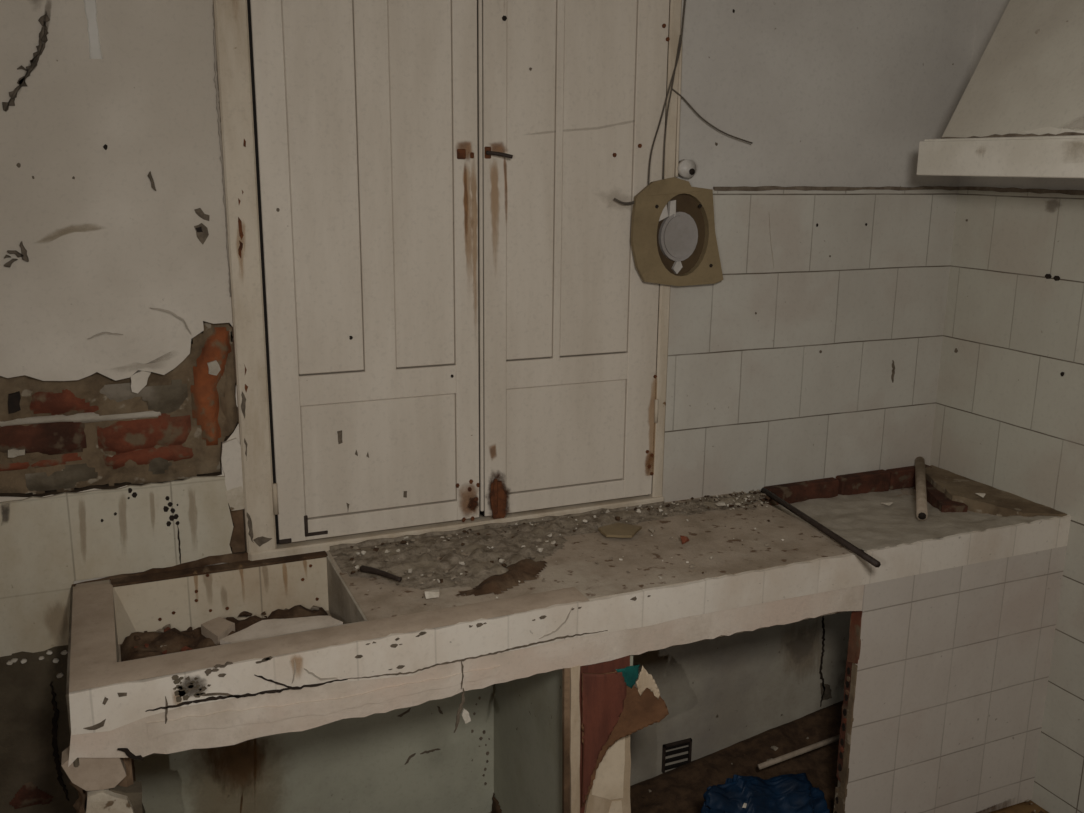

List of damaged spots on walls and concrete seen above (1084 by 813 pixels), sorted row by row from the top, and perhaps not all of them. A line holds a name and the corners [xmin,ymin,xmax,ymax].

crack [2,13,50,112]
rust [459,143,471,231]
rust [492,144,507,205]
flaking render [0,322,272,553]
rust [455,473,509,522]
crack [145,607,608,724]
crack [50,682,69,801]
water stain [208,738,264,813]